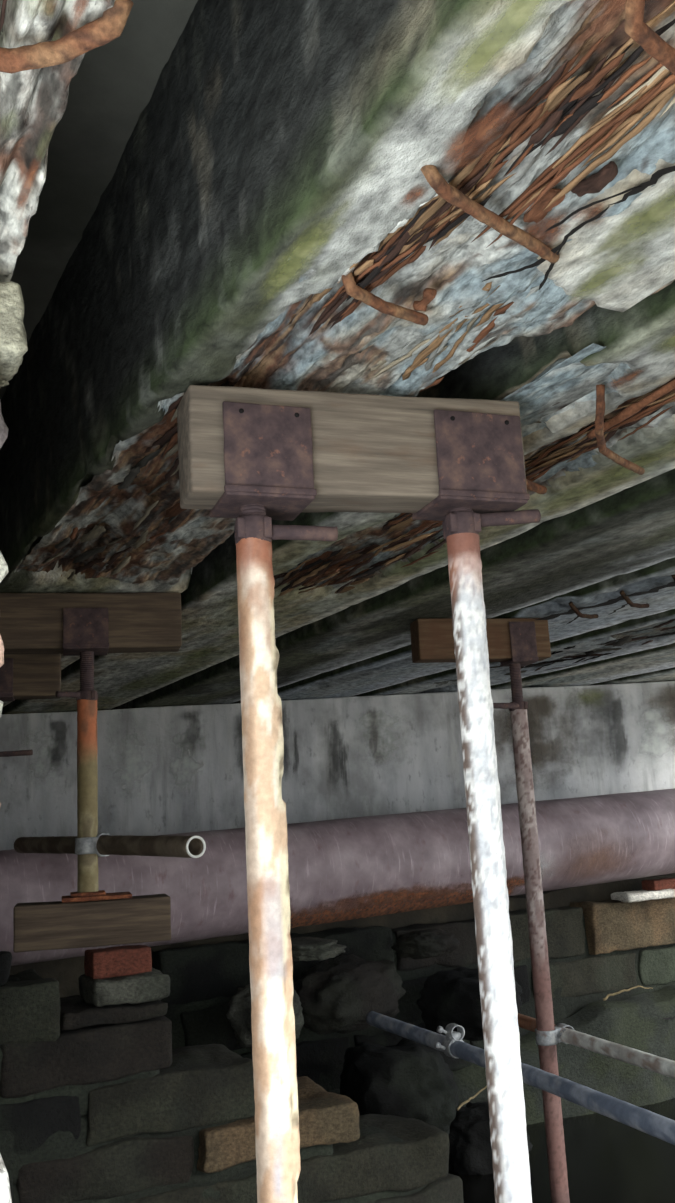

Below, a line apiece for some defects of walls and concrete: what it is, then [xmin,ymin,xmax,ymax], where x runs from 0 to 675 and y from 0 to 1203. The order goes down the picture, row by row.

rust [73,0,88,22]
rust [646,2,675,36]
rust [17,161,39,208]
spalling [208,0,675,397]
rust [308,37,675,337]
crack [483,166,675,290]
spalling [500,343,675,495]
spalling [14,392,236,585]
spalling [275,513,443,589]
water stain [282,710,299,770]
water stain [523,696,571,769]
water stain [596,687,675,758]